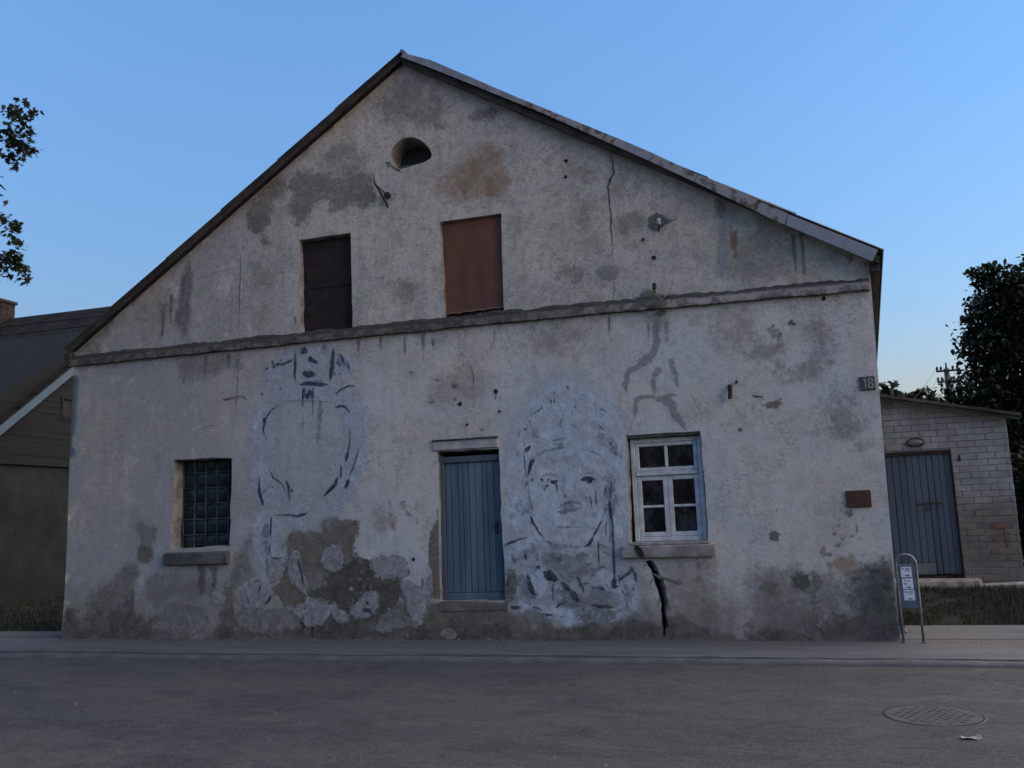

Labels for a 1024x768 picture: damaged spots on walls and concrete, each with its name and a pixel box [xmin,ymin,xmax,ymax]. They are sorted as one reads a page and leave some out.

crack [607,152,615,258]
damp [61,522,157,639]
peeling [235,509,441,636]
crack [634,545,682,637]
damp [750,558,899,641]